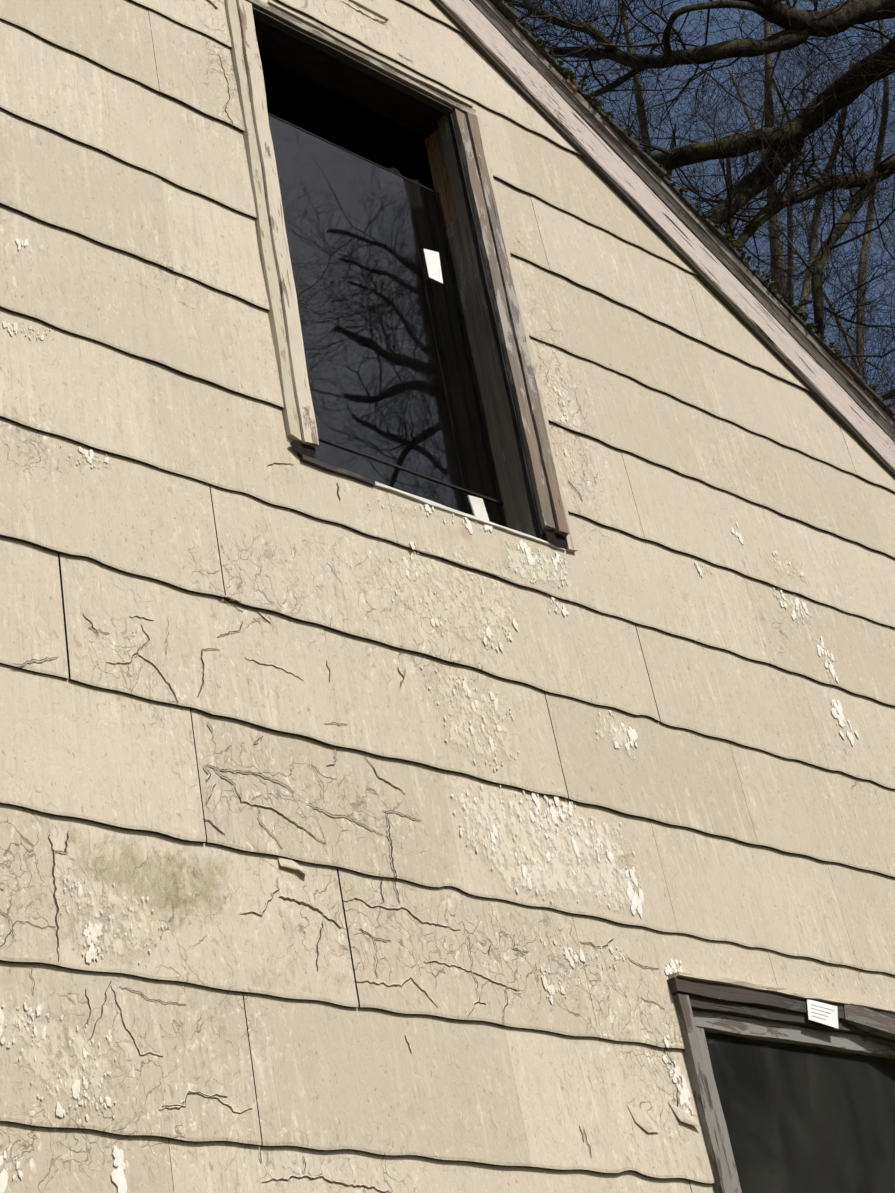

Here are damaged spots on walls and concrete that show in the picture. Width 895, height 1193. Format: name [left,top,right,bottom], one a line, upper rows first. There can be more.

crack [83,594,331,732]
crack [325,722,347,765]
peeling [421,666,519,772]
peeling [374,540,569,653]
peeling [596,711,638,759]
peeling [774,588,839,683]
crack [0,831,70,995]
crack [203,736,539,1023]
peeling [451,784,644,918]
peeling [0,1002,117,1121]
peeling [0,1150,23,1193]
peeling [111,1146,127,1193]